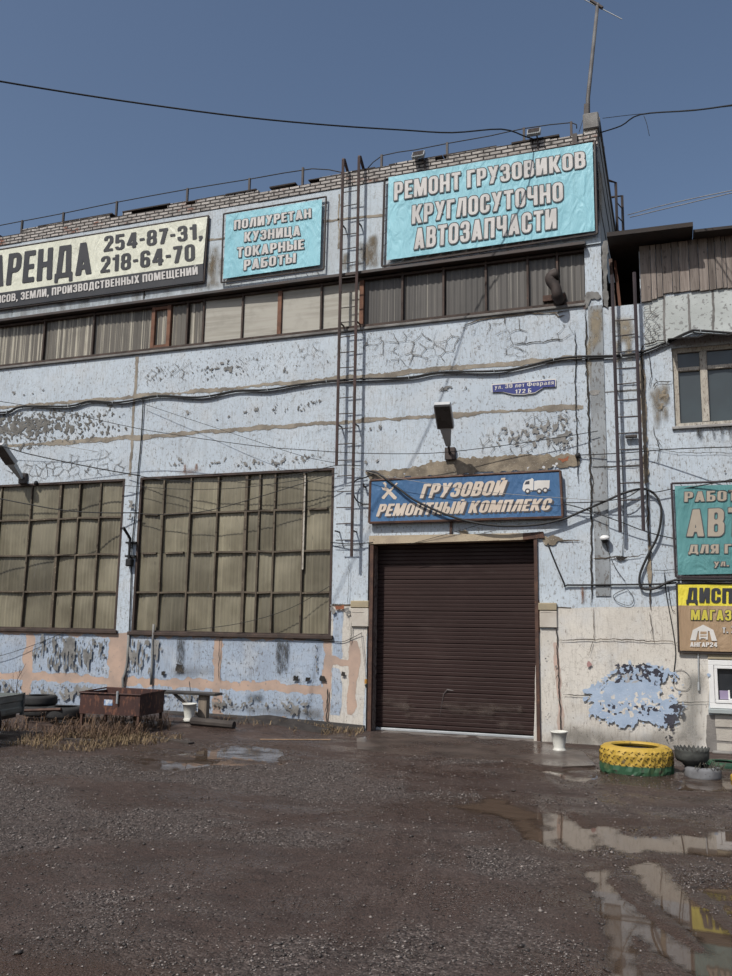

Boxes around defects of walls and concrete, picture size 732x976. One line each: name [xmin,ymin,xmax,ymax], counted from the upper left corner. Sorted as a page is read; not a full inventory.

peeling [0,404,129,451]
crack [362,303,729,730]
peeling [32,633,105,672]
peeling [211,693,311,717]
peeling [583,660,687,742]